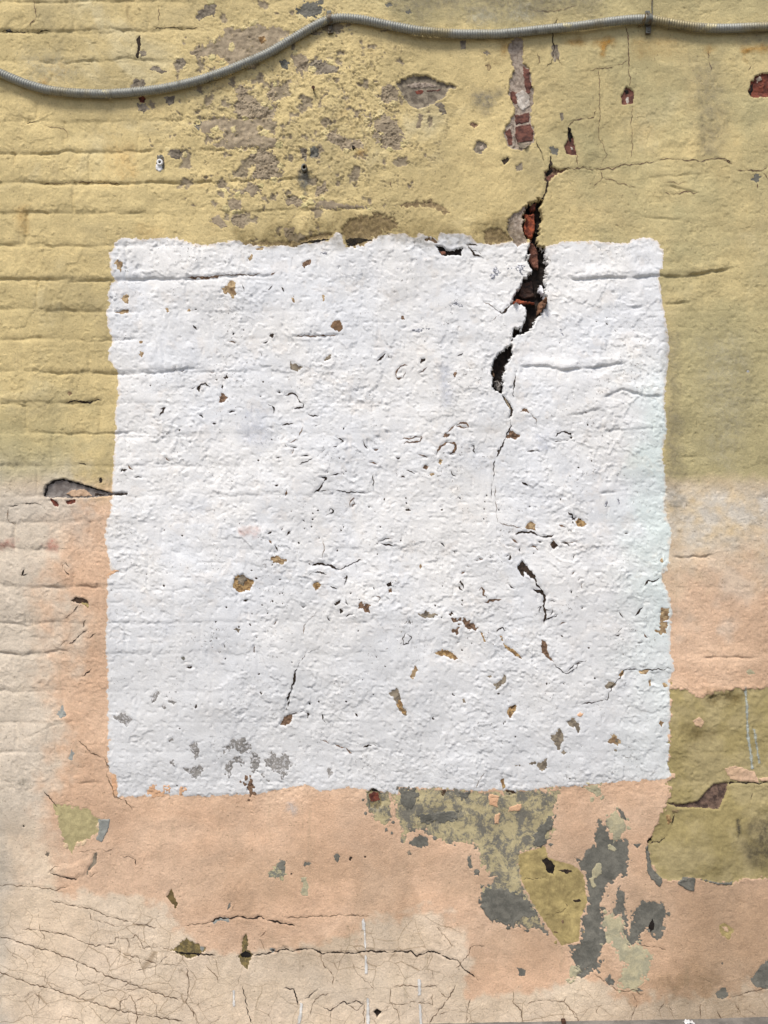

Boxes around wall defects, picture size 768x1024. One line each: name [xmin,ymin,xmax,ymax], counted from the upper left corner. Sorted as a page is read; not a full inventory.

peeling [130,19,290,114]
flaking render [502,37,535,171]
spalling [621,87,634,105]
spalling [748,73,768,98]
peeling [192,75,457,268]
flaking render [44,477,128,507]
crack [404,370,580,543]
crack [533,581,557,622]
peeling [53,804,110,875]
peeling [362,670,768,993]
crack [0,847,218,1023]
crack [187,903,481,1022]